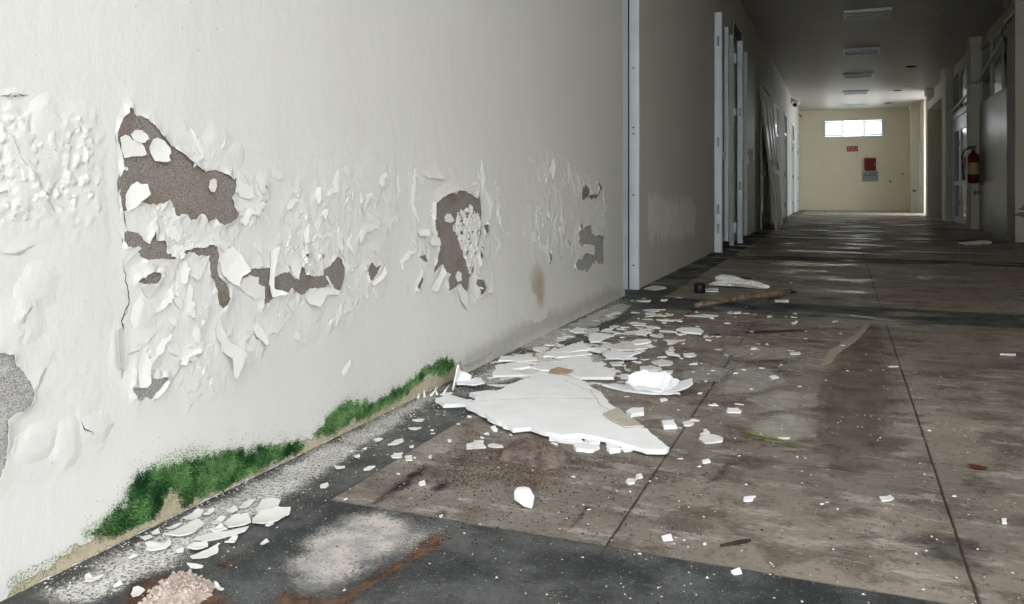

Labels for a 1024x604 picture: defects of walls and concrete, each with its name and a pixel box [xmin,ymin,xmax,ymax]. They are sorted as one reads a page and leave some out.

crack [121,272,130,329]
peeling [115,107,266,225]
peeling [122,231,344,378]
peeling [418,159,488,309]
peeling [568,223,604,278]
peeling [582,183,602,204]
peeling [0,353,35,477]
peeling [117,327,171,401]
damp [8,281,625,598]
corrosion [272,534,445,604]